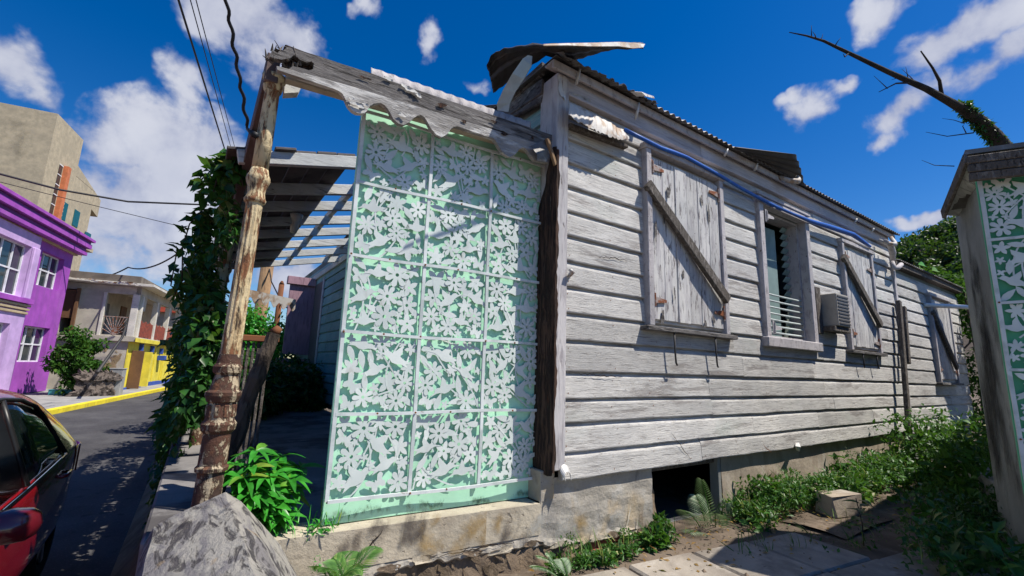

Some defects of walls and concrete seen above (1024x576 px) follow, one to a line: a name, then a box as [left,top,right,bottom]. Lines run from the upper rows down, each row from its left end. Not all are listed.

spalling [282,45,312,70]